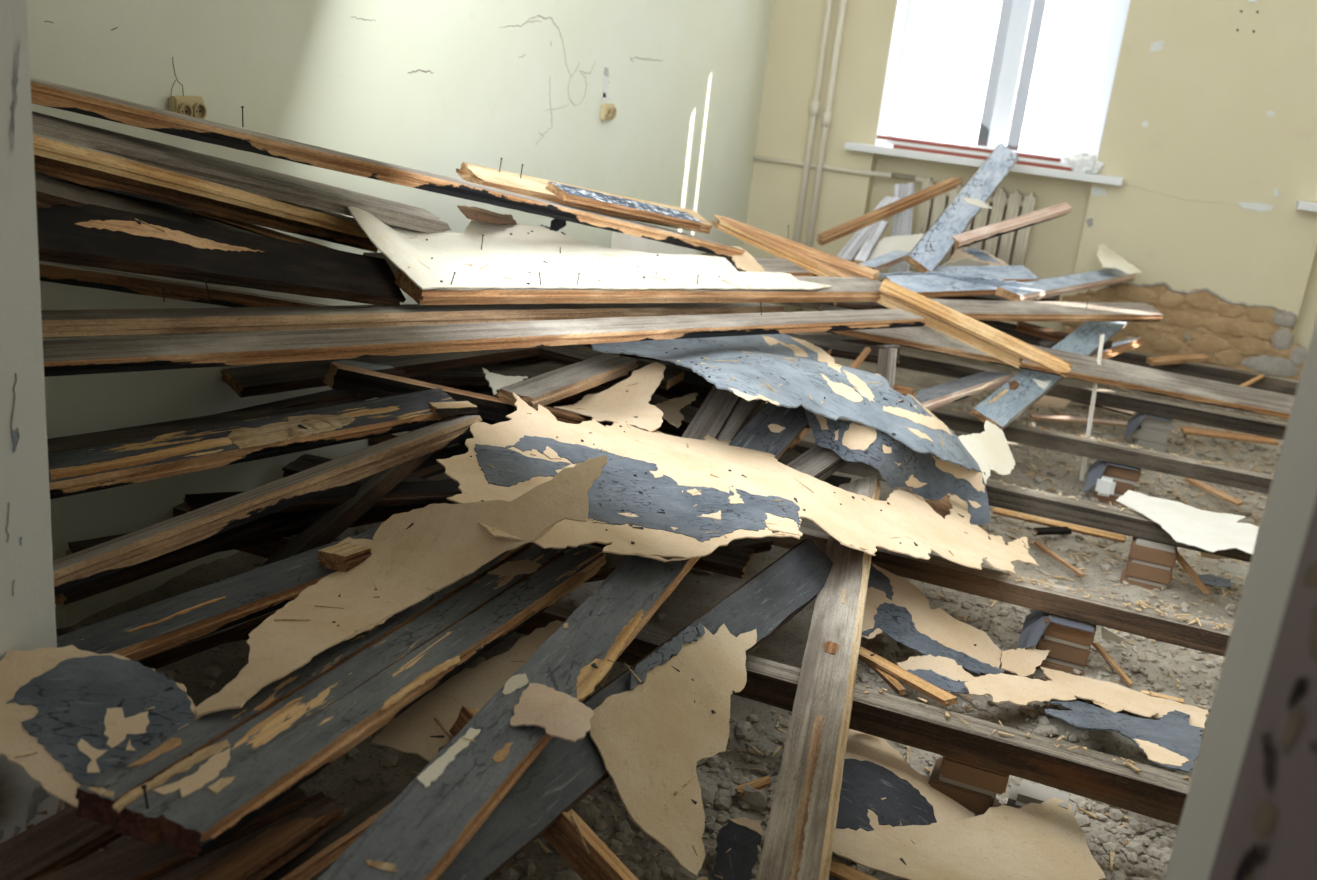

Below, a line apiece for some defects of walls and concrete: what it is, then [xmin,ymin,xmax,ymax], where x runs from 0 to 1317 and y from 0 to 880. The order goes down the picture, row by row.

crack [500,15,595,145]
flaking render [1061,282,1307,380]
spalling [1234,677,1317,880]